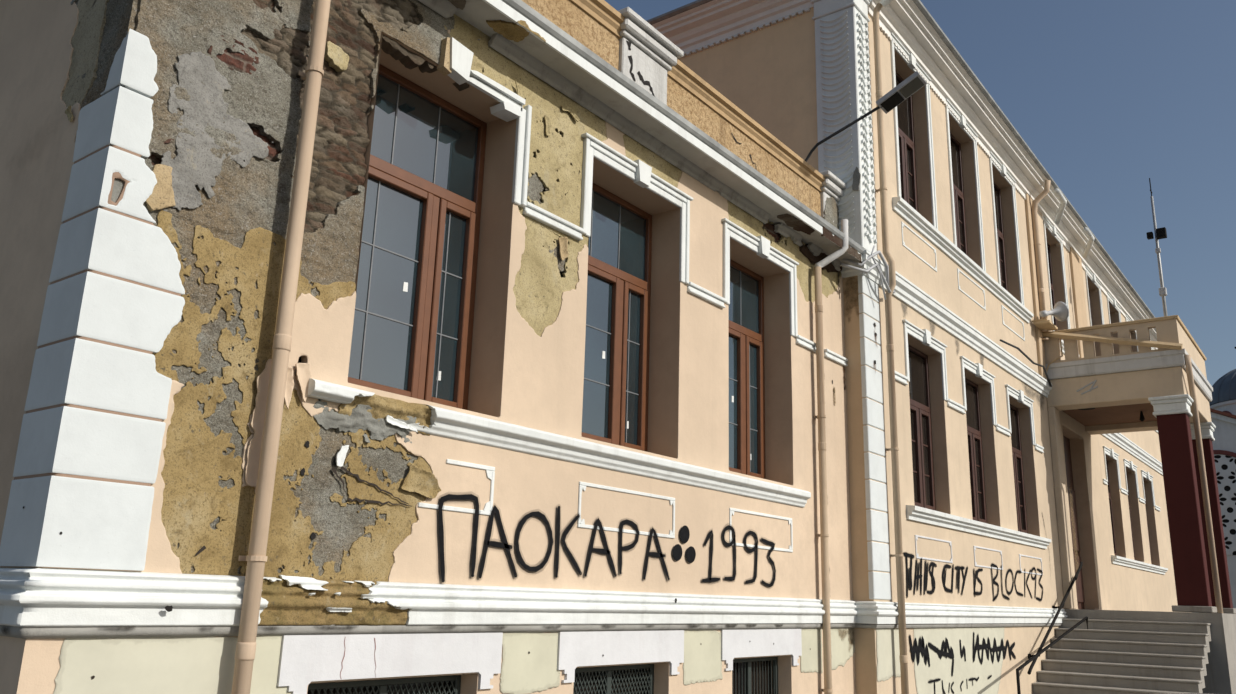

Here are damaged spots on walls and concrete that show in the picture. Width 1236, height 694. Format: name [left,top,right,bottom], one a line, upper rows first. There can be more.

flaking render [62,0,315,576]
flaking render [296,0,607,337]
crack [626,40,655,96]
peeling [623,134,682,187]
flaking render [727,200,841,303]
flaking render [264,362,441,612]